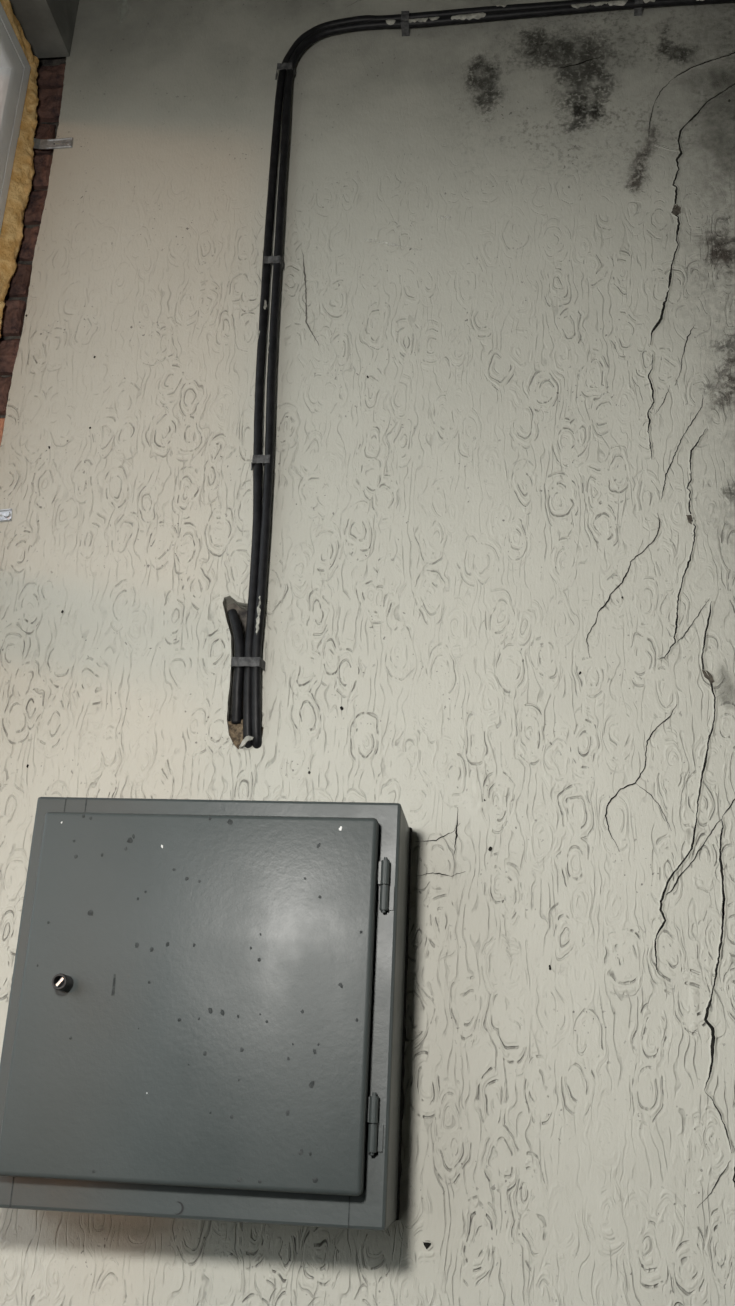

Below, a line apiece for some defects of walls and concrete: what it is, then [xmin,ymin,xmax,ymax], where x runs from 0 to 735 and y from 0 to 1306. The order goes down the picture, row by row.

water stain [468,57,499,106]
water stain [525,32,609,116]
water stain [629,144,650,190]
water stain [708,236,735,263]
crack [586,51,735,1208]